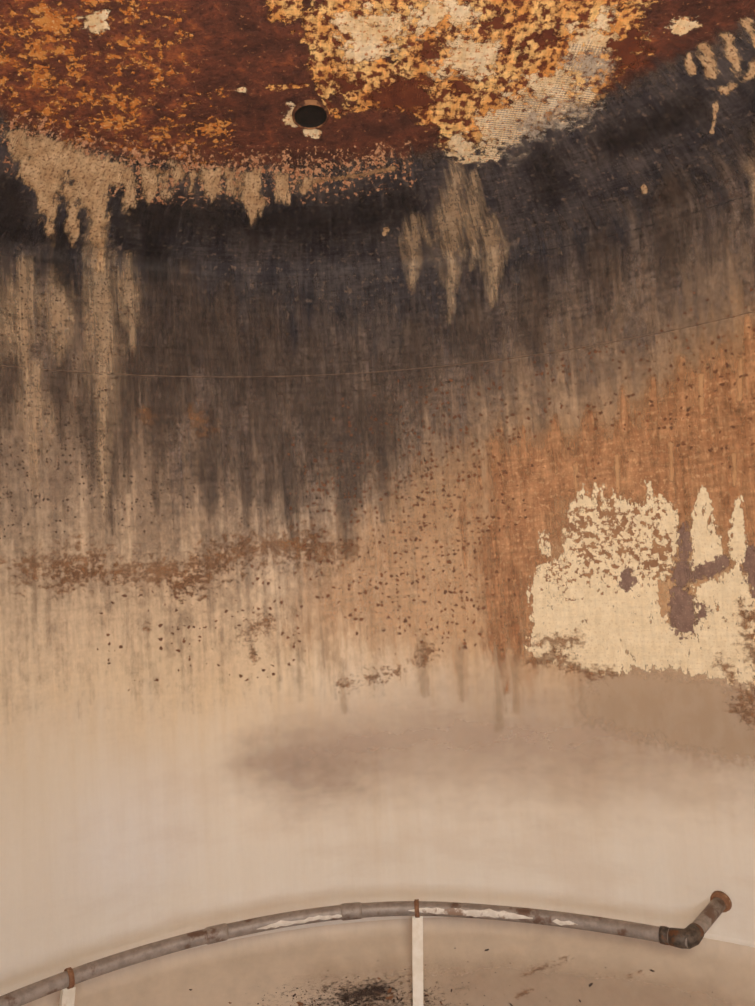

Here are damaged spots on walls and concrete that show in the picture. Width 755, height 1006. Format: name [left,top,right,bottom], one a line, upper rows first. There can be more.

corrosion [266,14,341,118]
peeling [266,0,658,166]
peeling [664,16,702,36]
peeling [685,33,755,134]
peeling [740,18,755,48]
corrosion [295,166,396,185]
water stain [0,147,755,563]
corrosion [470,314,755,680]
corrosion [1,526,359,601]
peeling [523,480,755,693]
corrosion [717,652,755,724]
water stain [344,972,719,1006]